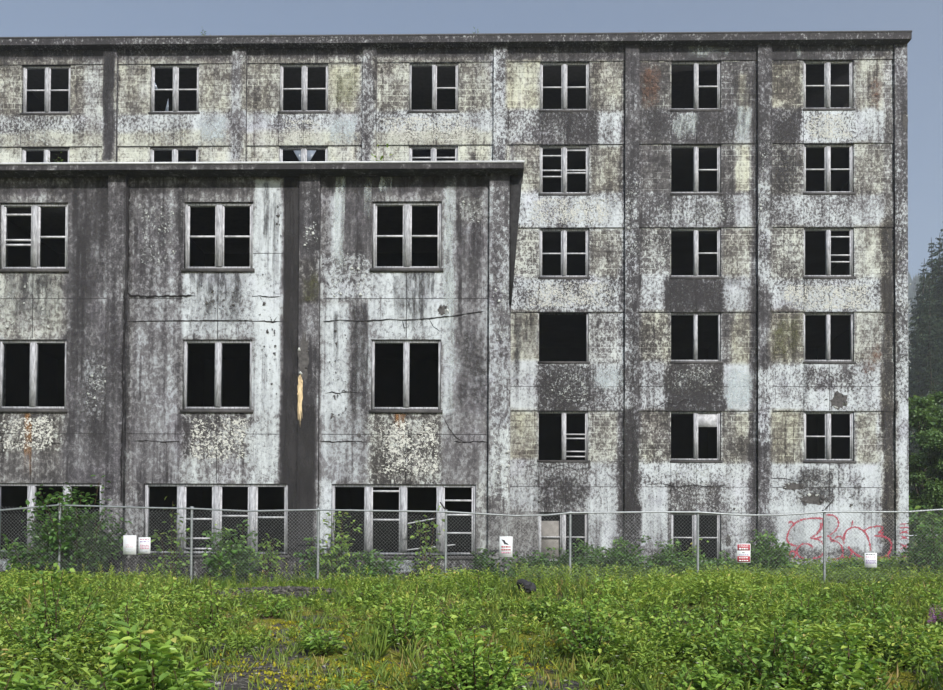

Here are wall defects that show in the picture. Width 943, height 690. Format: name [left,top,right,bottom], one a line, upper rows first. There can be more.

water stain [273,177,315,522]
spalling [297,331,309,424]